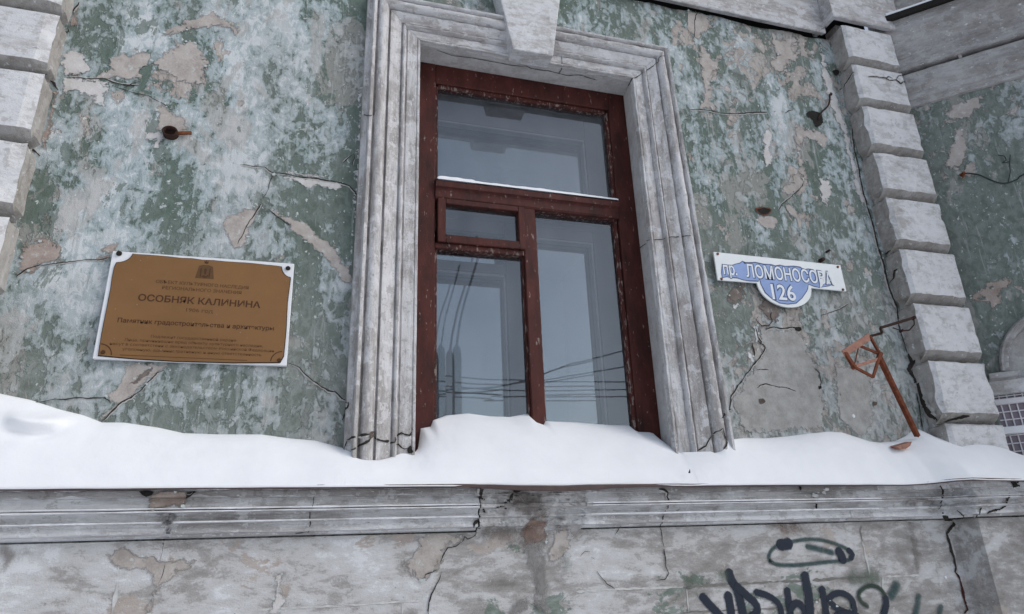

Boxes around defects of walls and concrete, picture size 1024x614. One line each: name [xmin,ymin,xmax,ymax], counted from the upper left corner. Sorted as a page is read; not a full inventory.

peeling [40,11,240,150]
peeling [272,171,342,190]
peeling [17,237,63,274]
peeling [223,206,352,284]